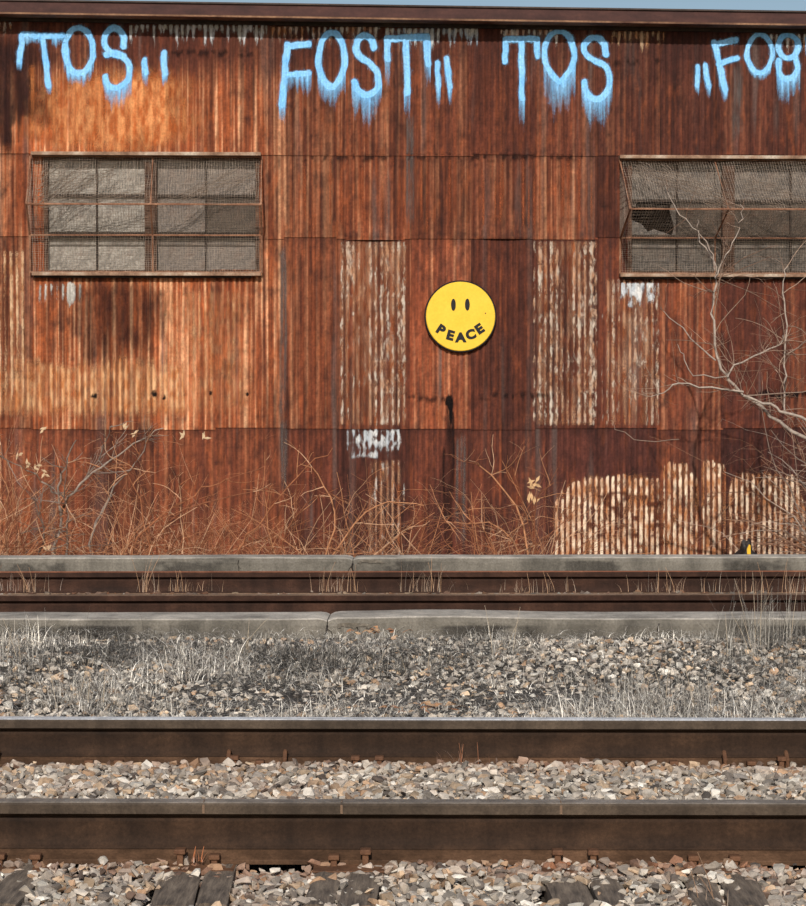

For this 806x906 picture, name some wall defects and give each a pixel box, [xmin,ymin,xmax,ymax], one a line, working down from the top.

rust [30,67,185,151]
rust [0,298,212,414]
peeling [340,241,406,564]
peeling [533,241,659,426]
rust [598,492,638,520]
peeling [555,460,805,555]